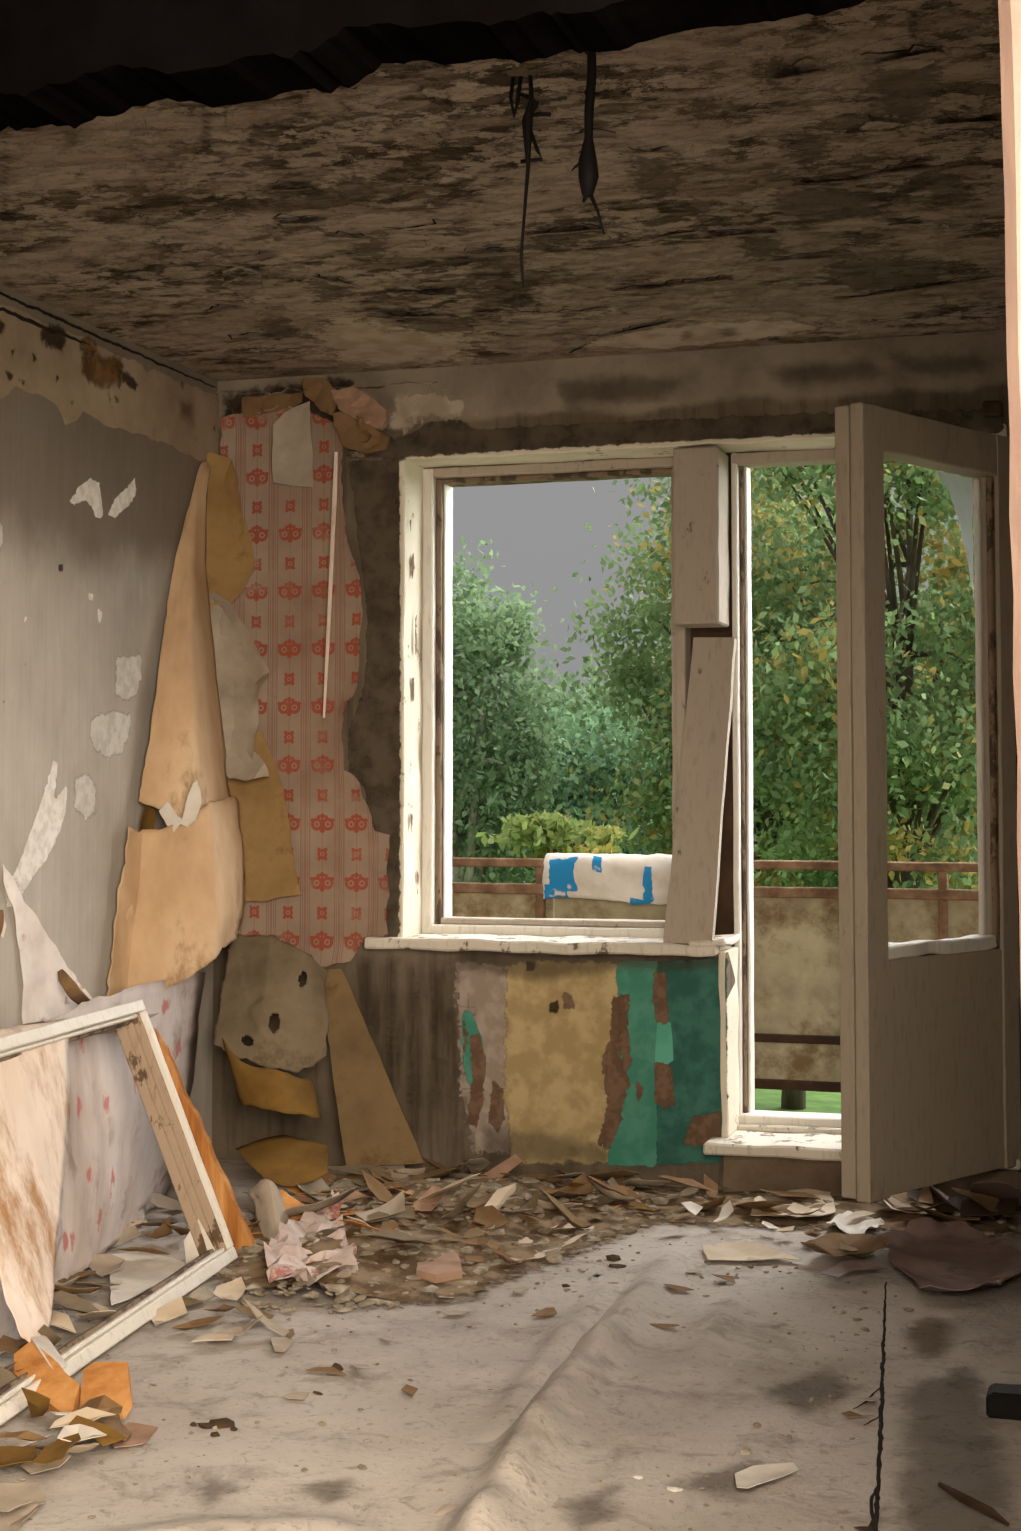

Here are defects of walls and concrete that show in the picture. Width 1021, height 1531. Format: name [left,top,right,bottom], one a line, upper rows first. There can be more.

leakage [33,324,67,361]
peeling [452,958,729,1168]
crack [853,1282,887,1531]